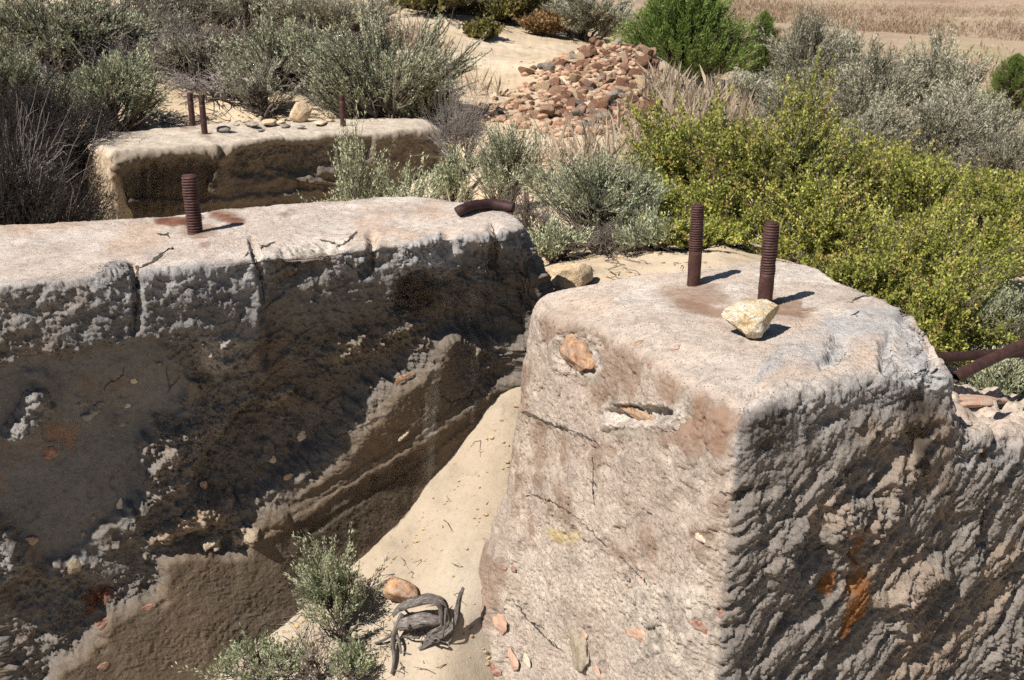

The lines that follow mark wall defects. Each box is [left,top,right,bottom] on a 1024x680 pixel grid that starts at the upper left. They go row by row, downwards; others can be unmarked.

corrosion [155,217,188,231]
corrosion [201,211,243,232]
crack [244,241,275,304]
spalling [593,398,697,432]
crack [518,409,651,587]
corrosion [817,528,869,642]